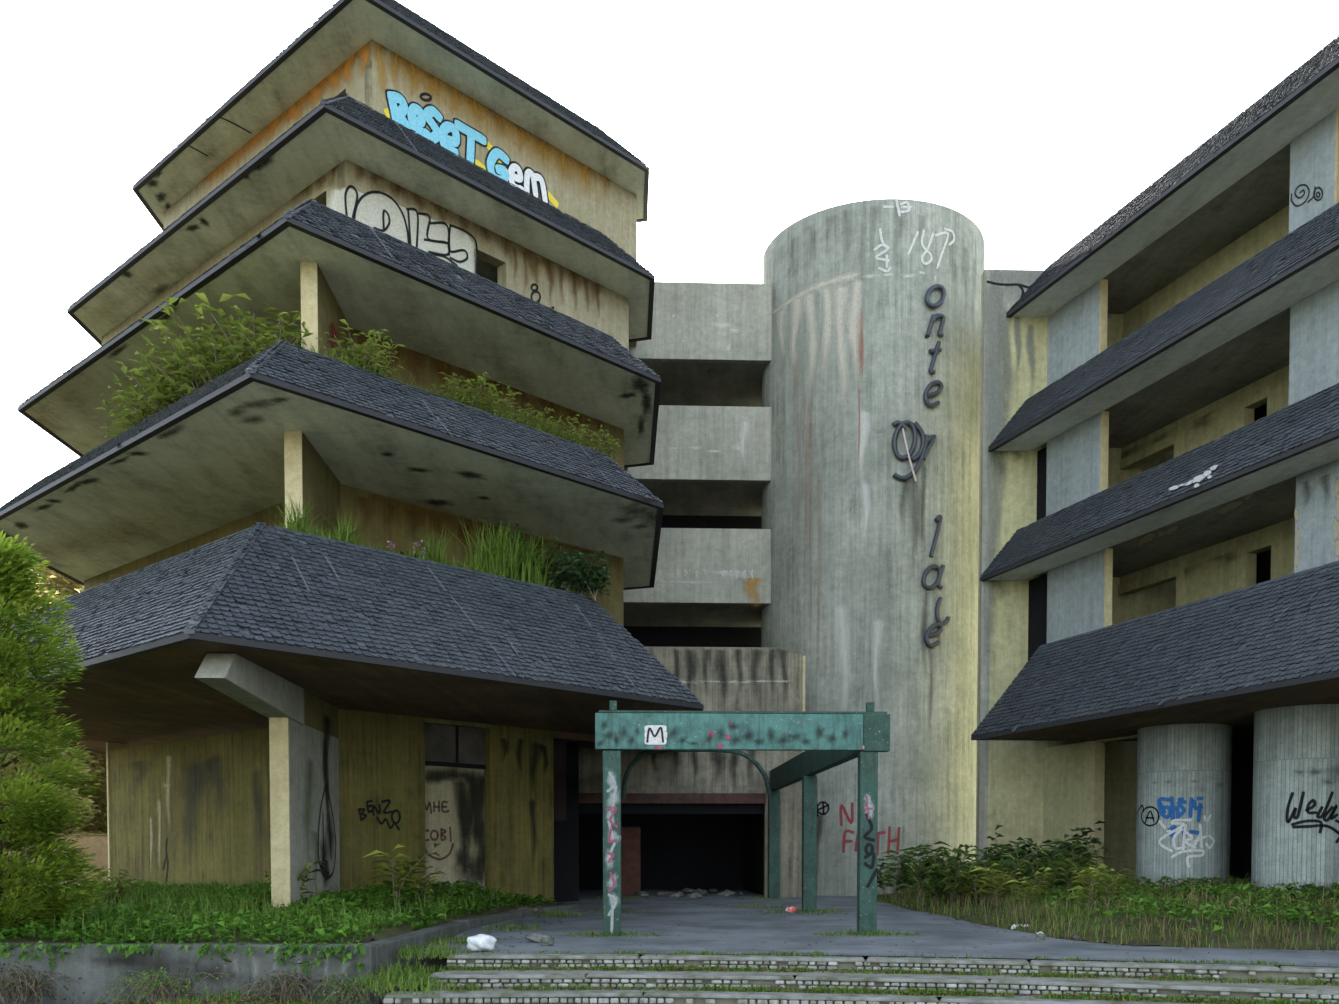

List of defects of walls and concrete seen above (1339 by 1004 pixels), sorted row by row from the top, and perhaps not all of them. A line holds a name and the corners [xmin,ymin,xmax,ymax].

rust [206,43,369,179]
leakage [505,238,599,306]
leakage [773,273,890,392]
leakage [859,412,869,463]
leakage [38,479,96,510]
leakage [675,650,787,689]
leakage [838,607,849,702]
leakage [150,756,171,855]